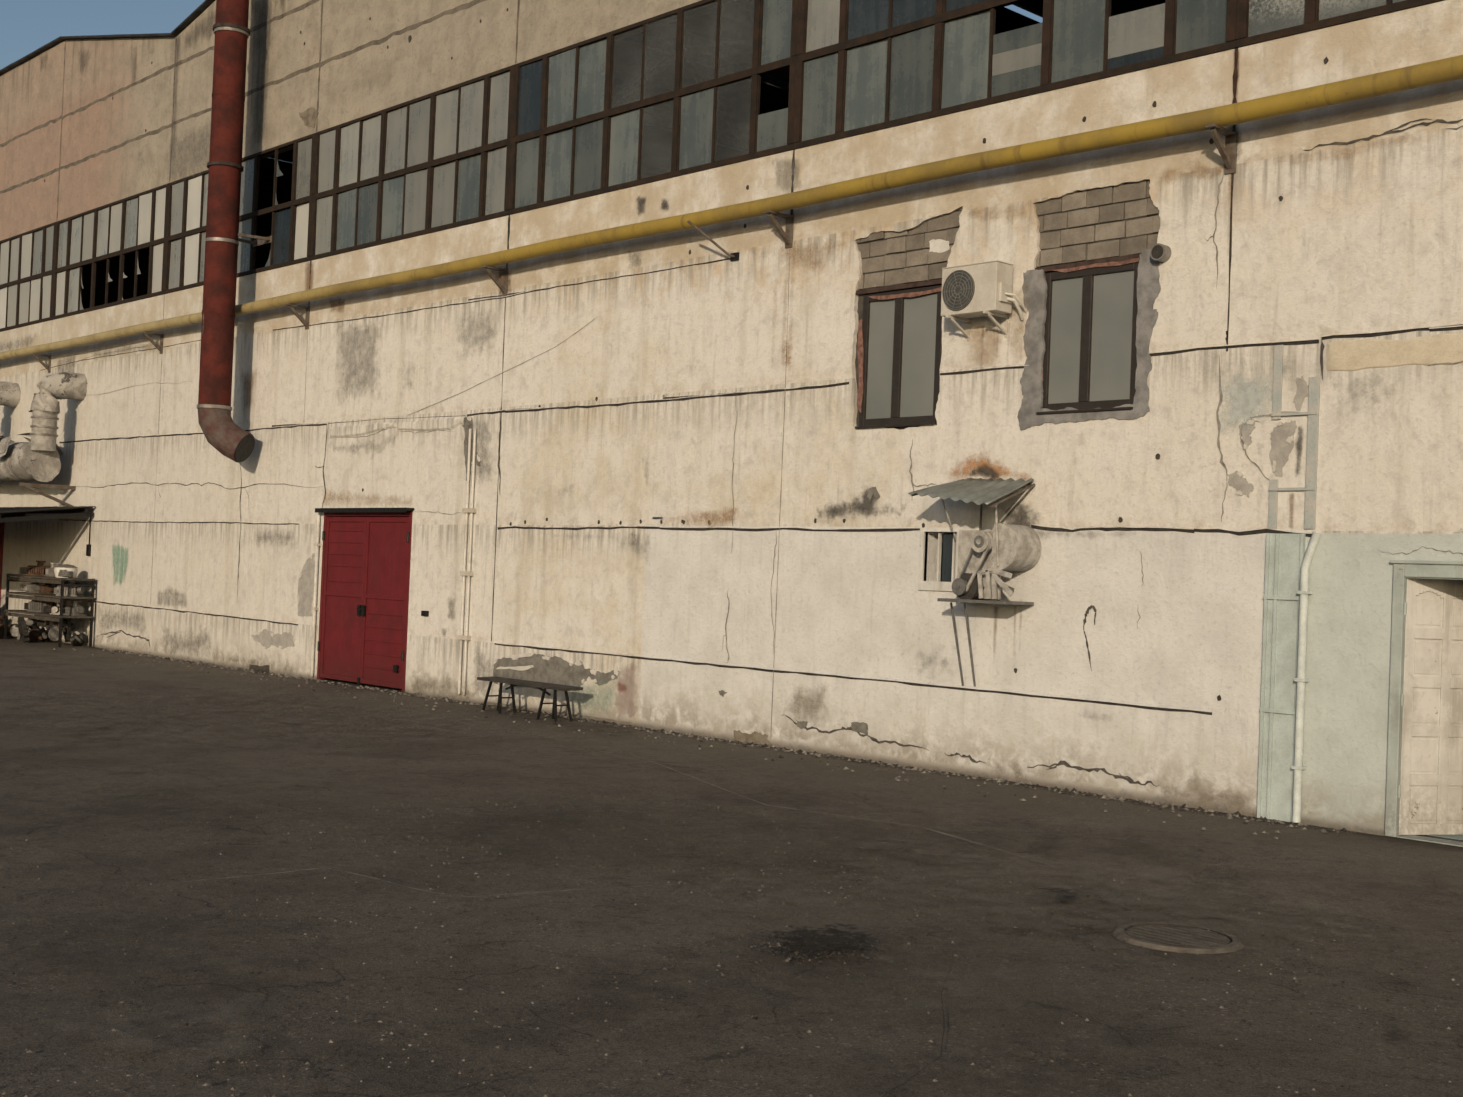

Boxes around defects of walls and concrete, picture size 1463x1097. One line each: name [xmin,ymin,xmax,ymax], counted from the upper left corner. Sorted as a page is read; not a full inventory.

crack [1305,118,1463,151]
peeling [1239,376,1309,477]
rust [956,459,1008,479]
peeling [1227,470,1254,498]
spalling [493,653,619,691]
crack [785,715,985,763]
crack [1027,761,1159,787]